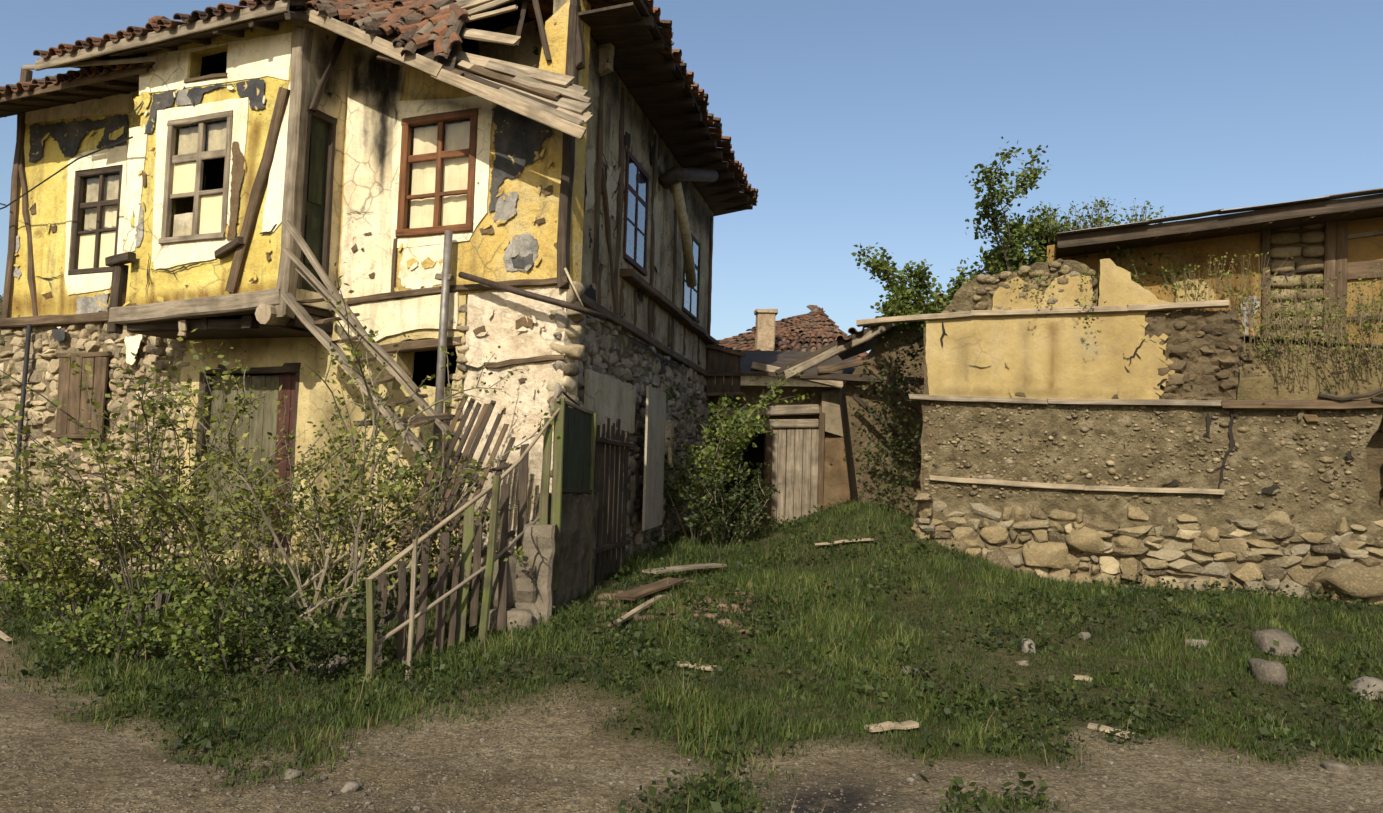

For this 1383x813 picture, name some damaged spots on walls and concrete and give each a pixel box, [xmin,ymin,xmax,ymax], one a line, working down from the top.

peeling [29,78,266,163]
peeling [477,105,557,272]
crack [1126,339,1167,386]
flaking render [1141,266,1260,401]
crack [1203,409,1239,489]